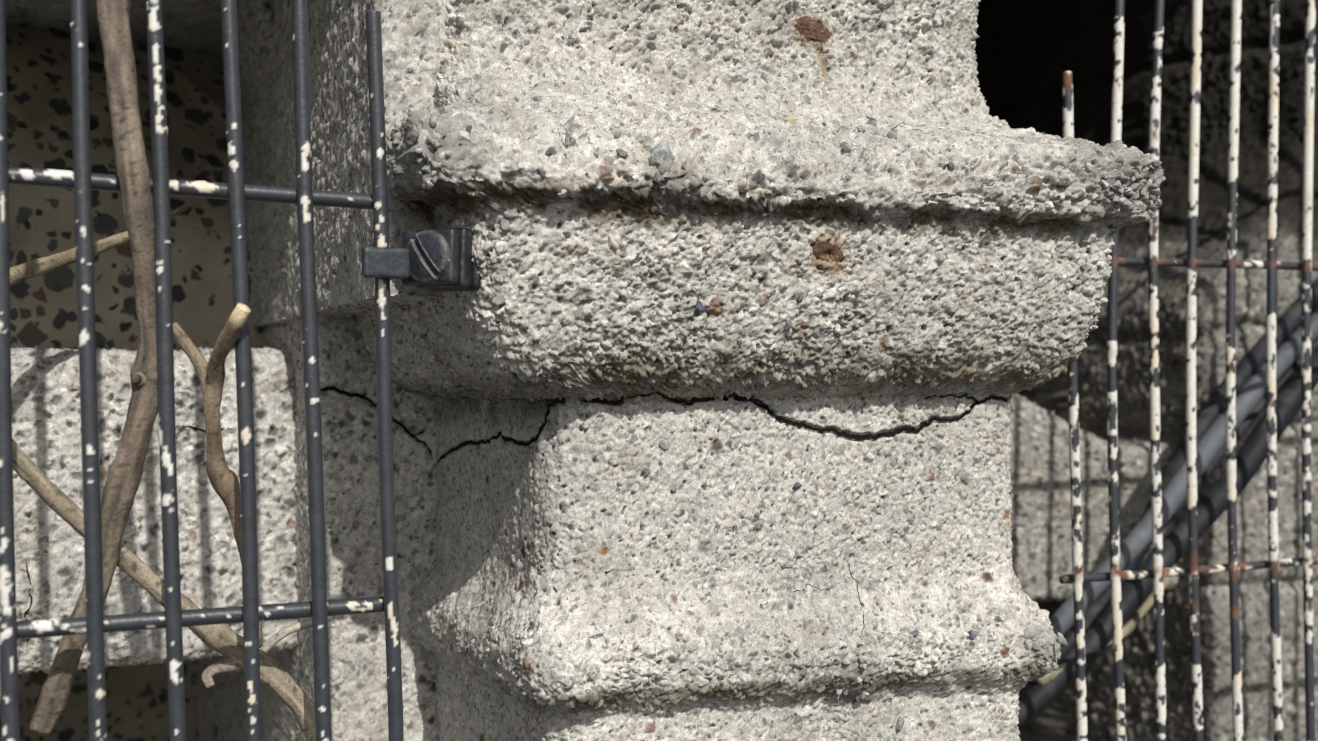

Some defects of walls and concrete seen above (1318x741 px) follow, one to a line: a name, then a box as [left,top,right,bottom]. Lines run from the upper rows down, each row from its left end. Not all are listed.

corrosion [794,16,831,69]
corrosion [812,239,844,270]
crack [320,387,1008,463]